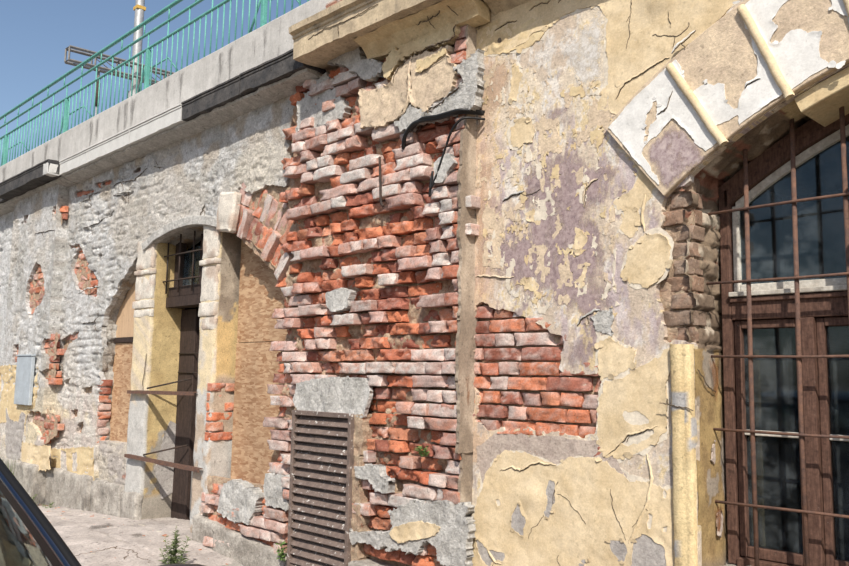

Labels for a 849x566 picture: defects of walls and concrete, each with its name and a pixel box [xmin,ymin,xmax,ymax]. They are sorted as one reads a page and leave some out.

crack [308,4,378,40]
crack [616,12,696,99]
crack [80,153,164,234]
spalling [29,264,45,315]
spalling [71,244,99,297]
flaking render [201,0,849,566]
peeling [0,332,113,481]
crack [606,425,660,456]
crack [610,454,654,544]